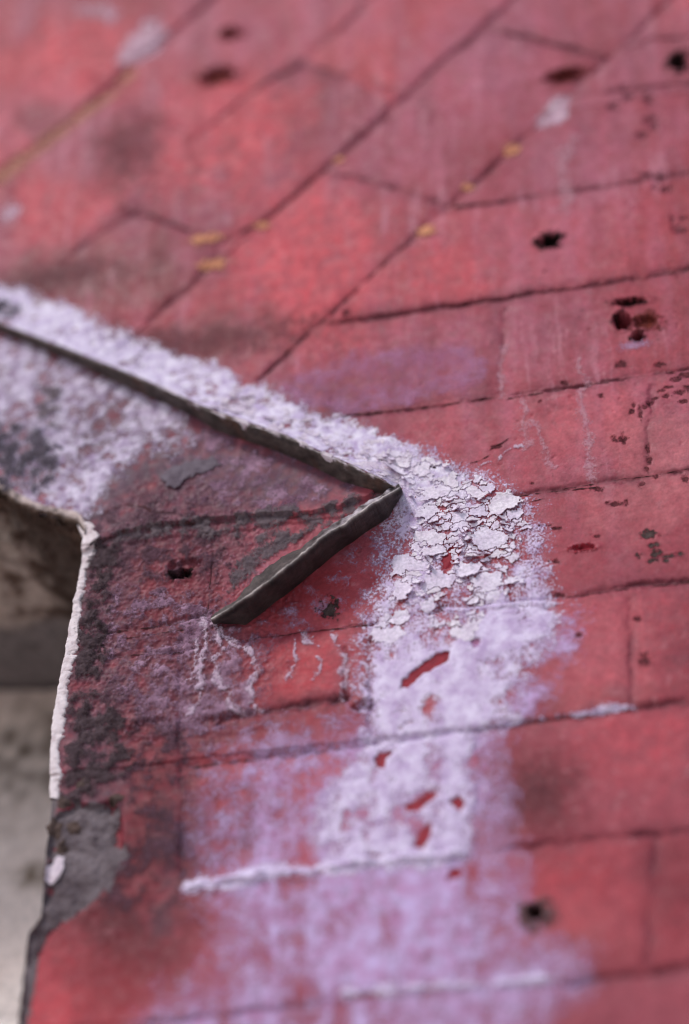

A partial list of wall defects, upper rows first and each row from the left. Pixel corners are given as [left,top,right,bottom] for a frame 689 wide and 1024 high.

spalling [605,296,647,307]
peeling [629,361,689,417]
peeling [160,455,222,488]
peeling [210,389,562,648]
peeling [635,528,683,563]
damp [0,283,587,1024]
peeling [399,651,450,689]
spalling [0,486,129,1024]
peeling [374,751,392,769]
peeling [407,792,436,811]
peeling [450,795,466,811]
peeling [413,823,432,849]